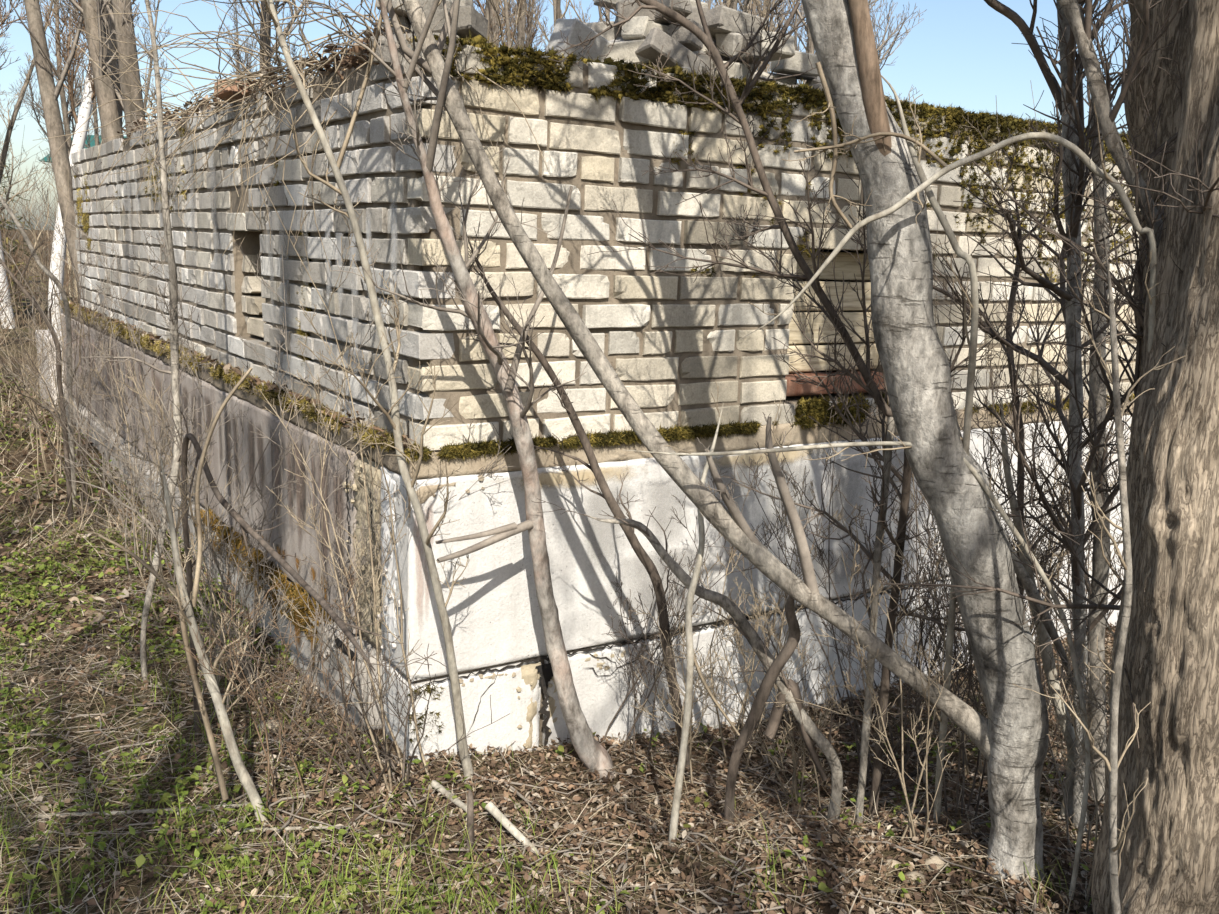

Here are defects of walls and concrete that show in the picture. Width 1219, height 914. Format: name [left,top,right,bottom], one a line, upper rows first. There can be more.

damp [66,332,342,568]
spalling [459,660,558,750]